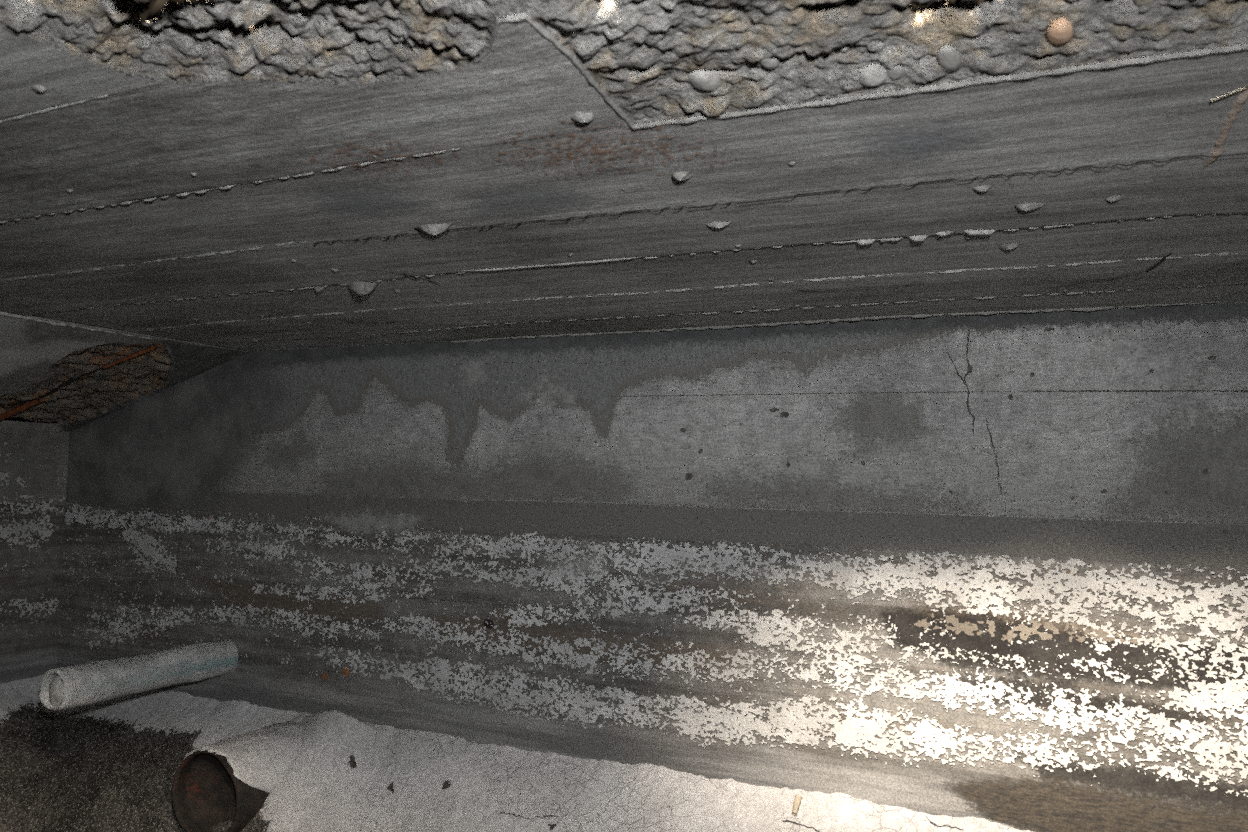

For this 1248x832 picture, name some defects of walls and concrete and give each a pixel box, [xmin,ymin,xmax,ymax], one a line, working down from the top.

spalling [0,0,1248,130]
spalling [0,339,174,427]
water stain [0,302,1248,579]
crack [609,331,1248,493]
peeling [0,443,1248,797]
water stain [881,608,1248,723]
water stain [0,700,206,832]
water stain [213,803,284,832]
crack [498,811,557,819]
crack [781,819,820,832]